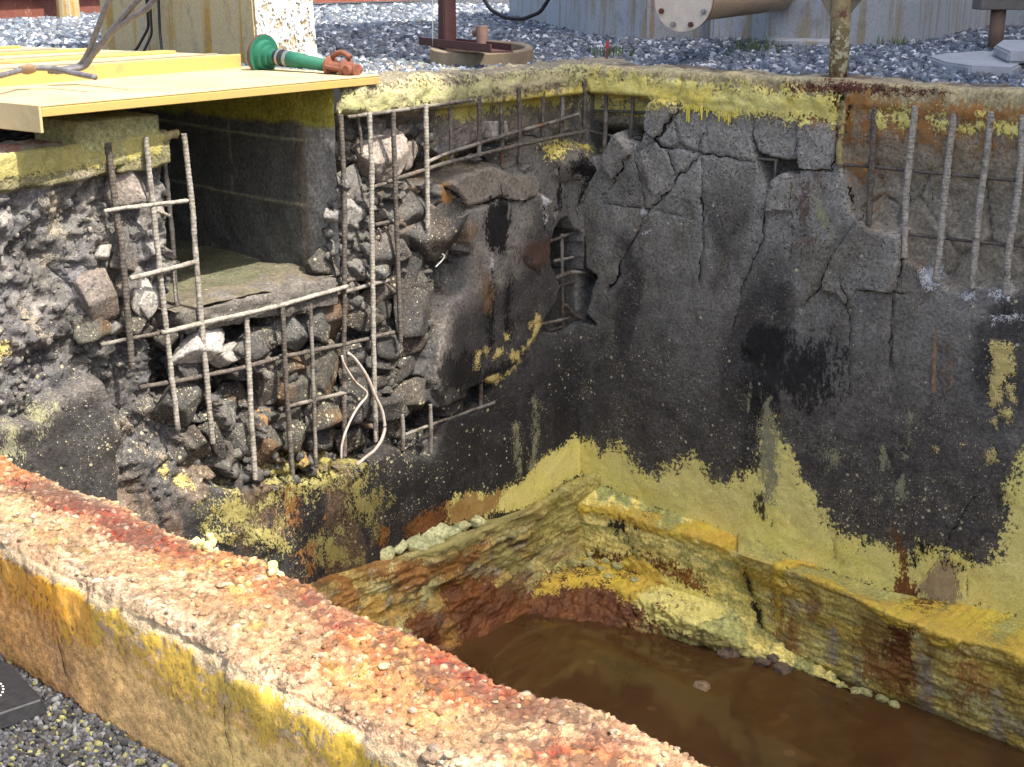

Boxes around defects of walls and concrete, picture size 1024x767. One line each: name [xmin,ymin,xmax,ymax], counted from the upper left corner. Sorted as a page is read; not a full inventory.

spalling [0,325,32,395]
spalling [8,215,38,288]
spalling [40,81,651,490]
crack [444,82,756,291]
crack [733,105,906,394]
rust [751,76,1024,225]
spalling [833,90,1024,295]
water stain [958,283,1024,327]
water stain [445,312,1024,619]
rust [263,483,714,651]
rust [884,525,952,616]